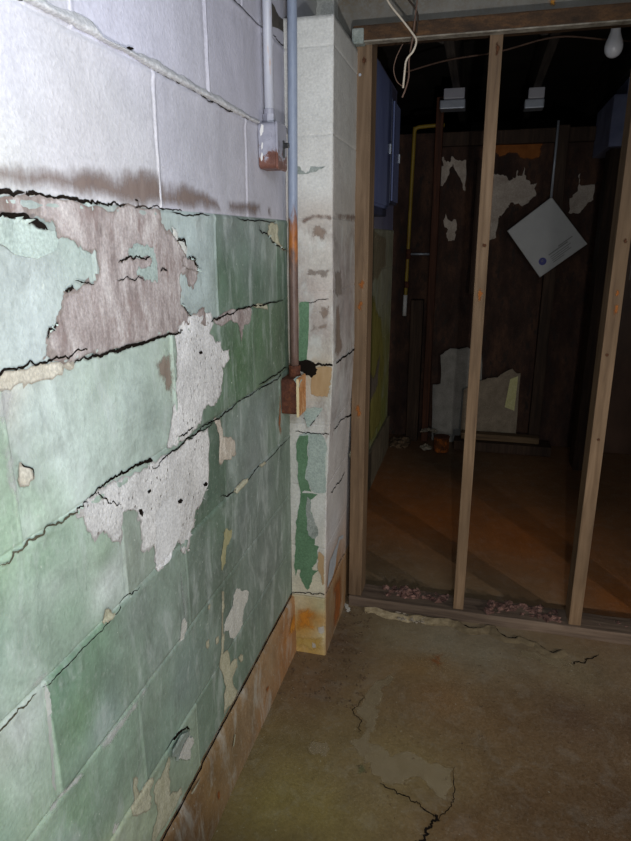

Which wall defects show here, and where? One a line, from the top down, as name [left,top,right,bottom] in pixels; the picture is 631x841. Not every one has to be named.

crack [0,188,210,217]
leakage [0,171,217,207]
leakage [230,204,258,214]
peeling [441,157,466,190]
peeling [489,167,537,240]
crack [0,329,182,376]
peeling [0,194,236,572]
crack [211,300,283,341]
crack [1,348,355,565]
peeling [294,407,327,590]
crack [0,587,140,731]
peeling [206,588,249,714]